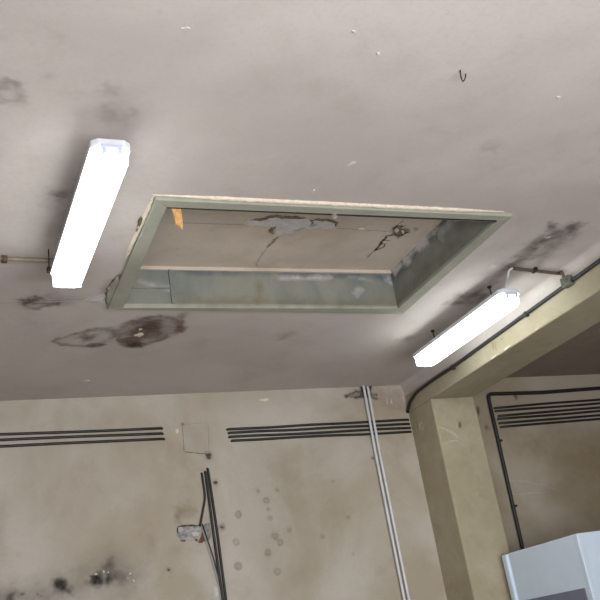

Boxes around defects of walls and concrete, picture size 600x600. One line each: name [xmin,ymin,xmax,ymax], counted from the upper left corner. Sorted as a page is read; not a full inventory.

peeling [246,215,338,235]